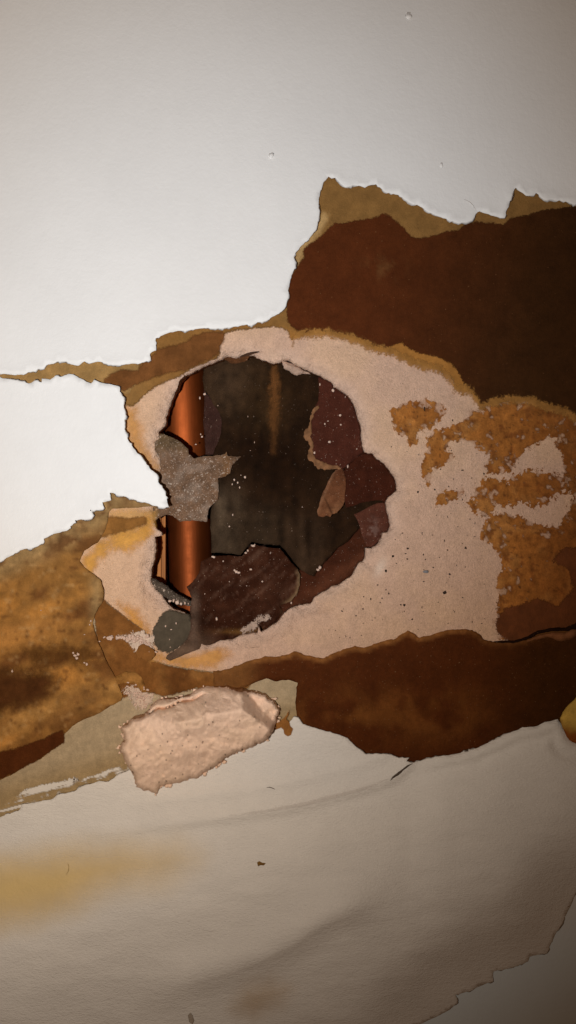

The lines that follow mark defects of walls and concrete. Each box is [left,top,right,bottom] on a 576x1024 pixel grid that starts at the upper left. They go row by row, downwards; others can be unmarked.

leakage [286,206,576,423]
leakage [83,511,153,572]
spalling [80,326,576,672]
leakage [496,547,576,641]
leakage [0,650,90,711]
leakage [0,730,65,778]